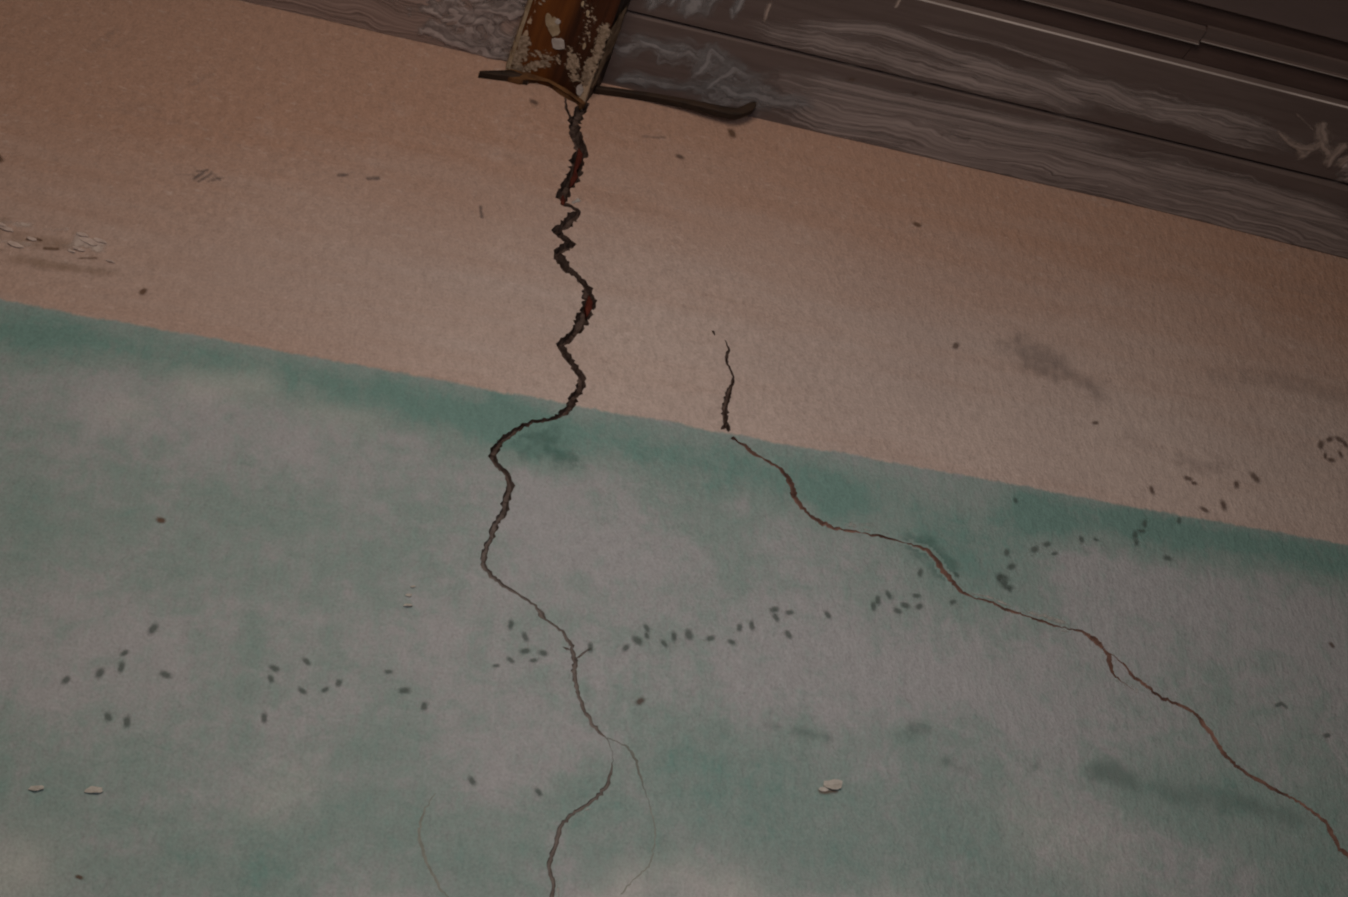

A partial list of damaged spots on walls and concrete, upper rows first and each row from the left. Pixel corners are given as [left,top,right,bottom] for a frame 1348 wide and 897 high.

crack [480,98,656,897]
crack [712,331,1348,858]